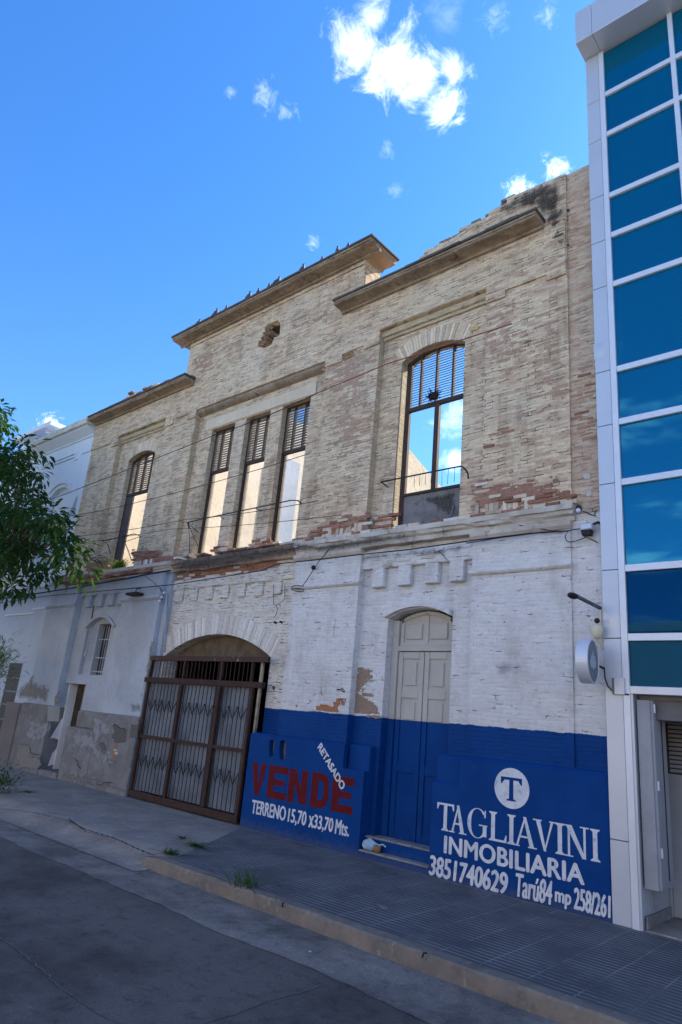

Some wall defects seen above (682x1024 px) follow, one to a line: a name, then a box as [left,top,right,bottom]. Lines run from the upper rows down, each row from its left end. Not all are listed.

water stain [500,183,570,246]
spalling [259,329,279,348]
peeling [471,476,577,513]
flaking render [292,512,401,541]
peeling [296,667,382,719]
peeling [70,718,138,763]